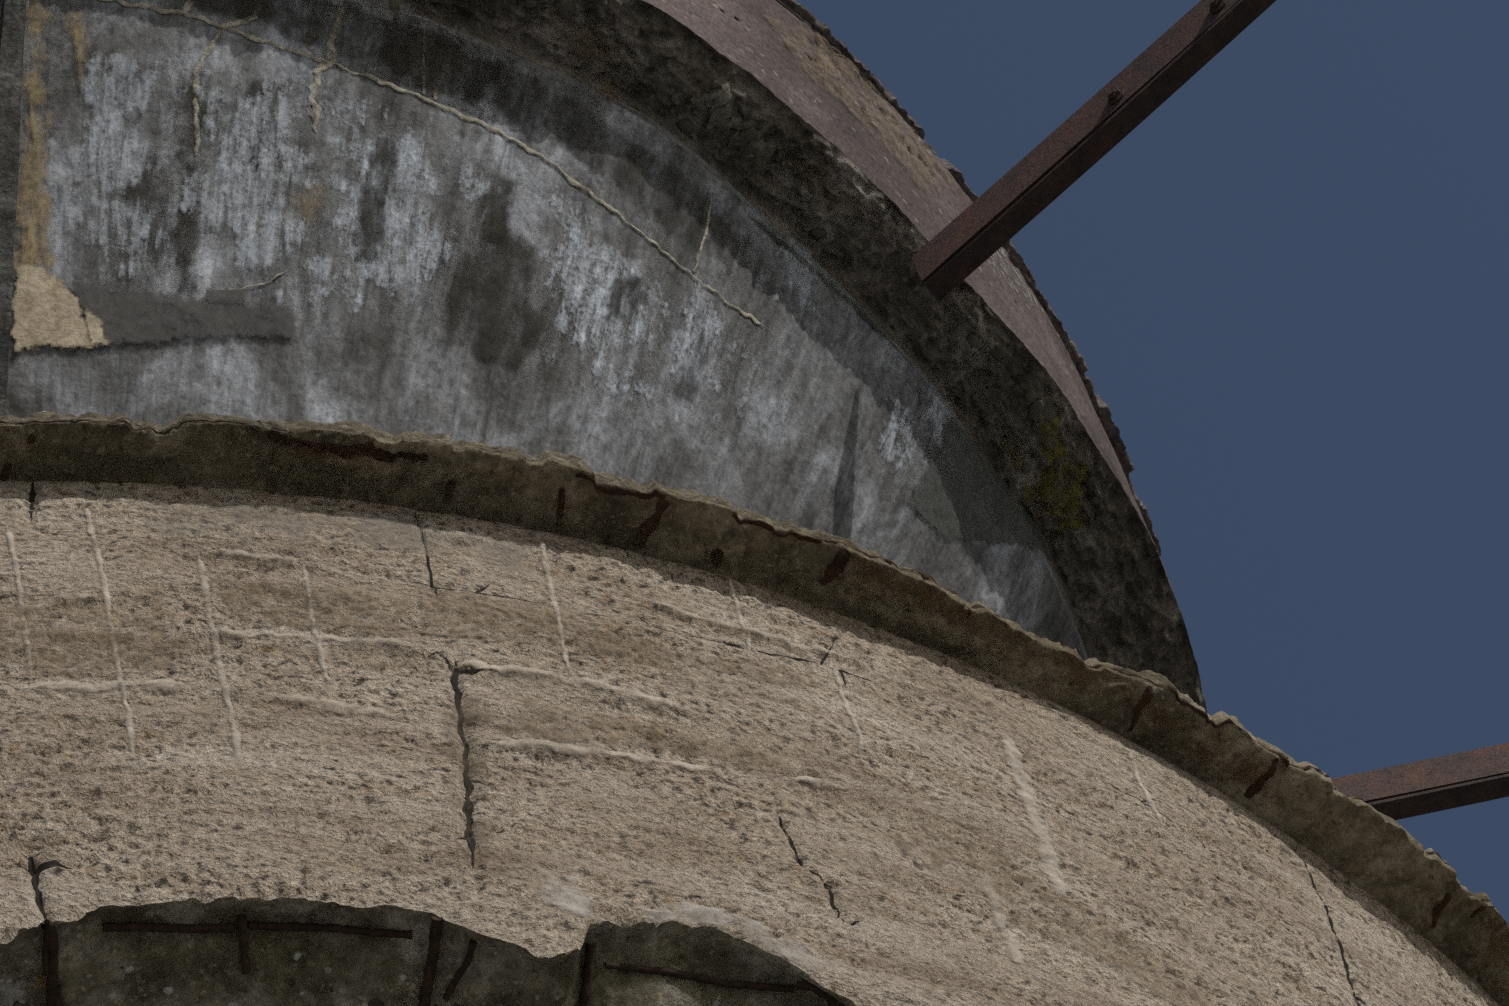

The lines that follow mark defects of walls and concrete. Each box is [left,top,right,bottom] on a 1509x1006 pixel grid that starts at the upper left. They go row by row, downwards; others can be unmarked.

peeling [11,264,296,351]
water stain [77,54,307,290]
crack [103,0,767,328]
water stain [195,0,739,255]
water stain [308,101,668,399]
water stain [671,283,723,398]
water stain [908,399,1047,552]
crack [427,652,485,868]
spalling [41,919,64,1006]
spalling [103,914,477,1006]
spalling [579,943,841,1006]
crack [1295,843,1367,1006]